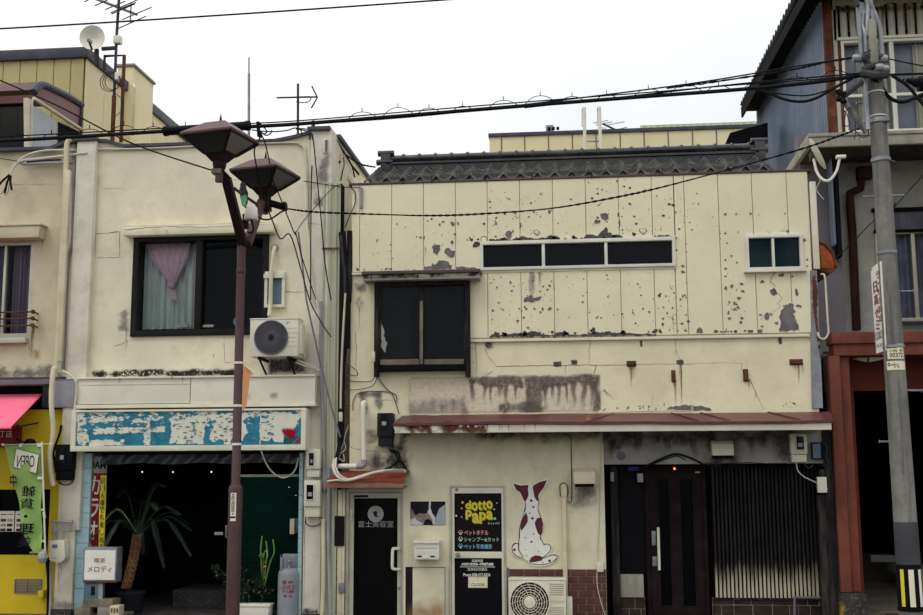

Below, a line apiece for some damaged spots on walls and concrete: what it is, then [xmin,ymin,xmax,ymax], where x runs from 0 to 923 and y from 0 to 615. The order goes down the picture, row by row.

peeling [467,180,638,248]
peeling [356,218,479,278]
peeling [485,265,703,348]
peeling [714,255,802,344]
damp [92,369,234,377]
damp [470,374,600,413]
corrosion [406,421,488,434]
damp [478,431,736,462]
damp [738,430,792,456]